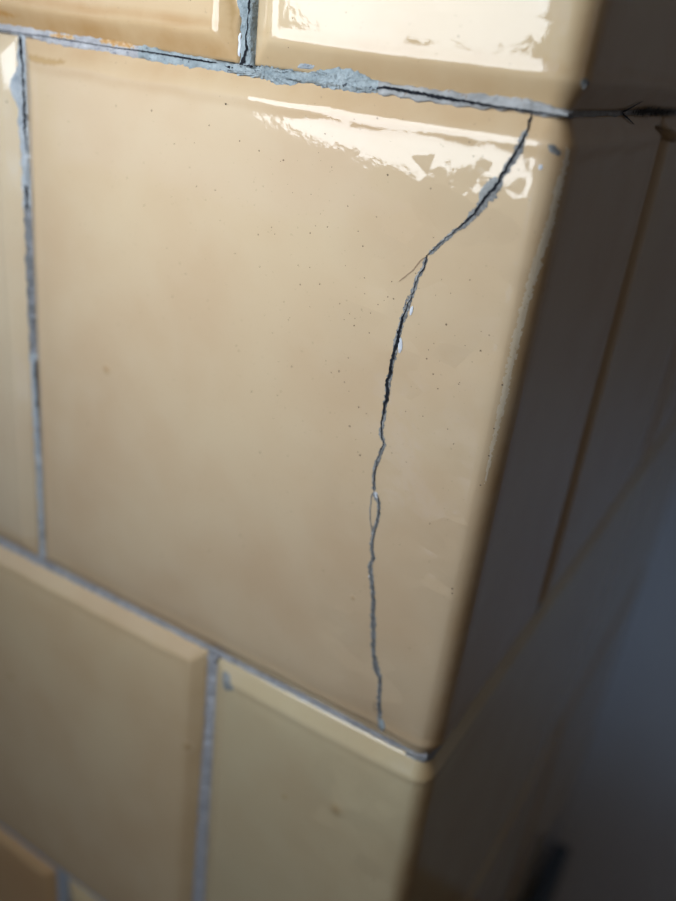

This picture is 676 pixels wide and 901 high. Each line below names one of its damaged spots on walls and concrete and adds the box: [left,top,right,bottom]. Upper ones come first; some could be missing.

crack [367,86,574,731]